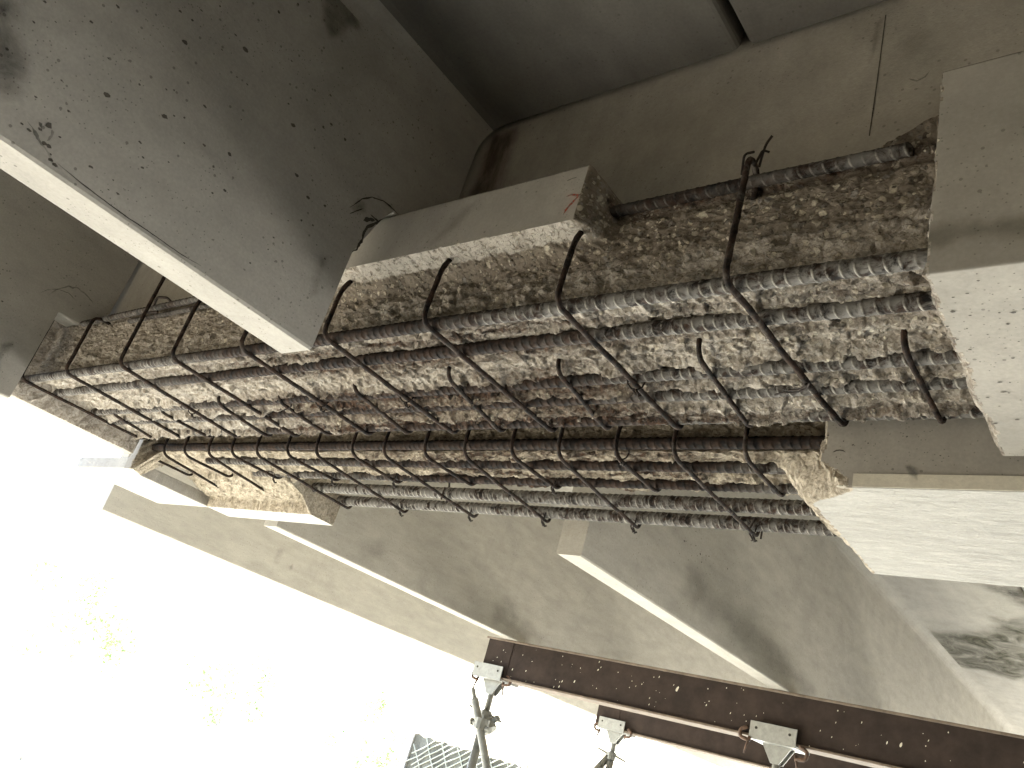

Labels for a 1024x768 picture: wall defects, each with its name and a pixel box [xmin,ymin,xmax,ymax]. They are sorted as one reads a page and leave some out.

crack [869,15,886,136]
crack [350,197,398,252]
spalling [11,74,1005,574]
leakage [942,627,1024,677]